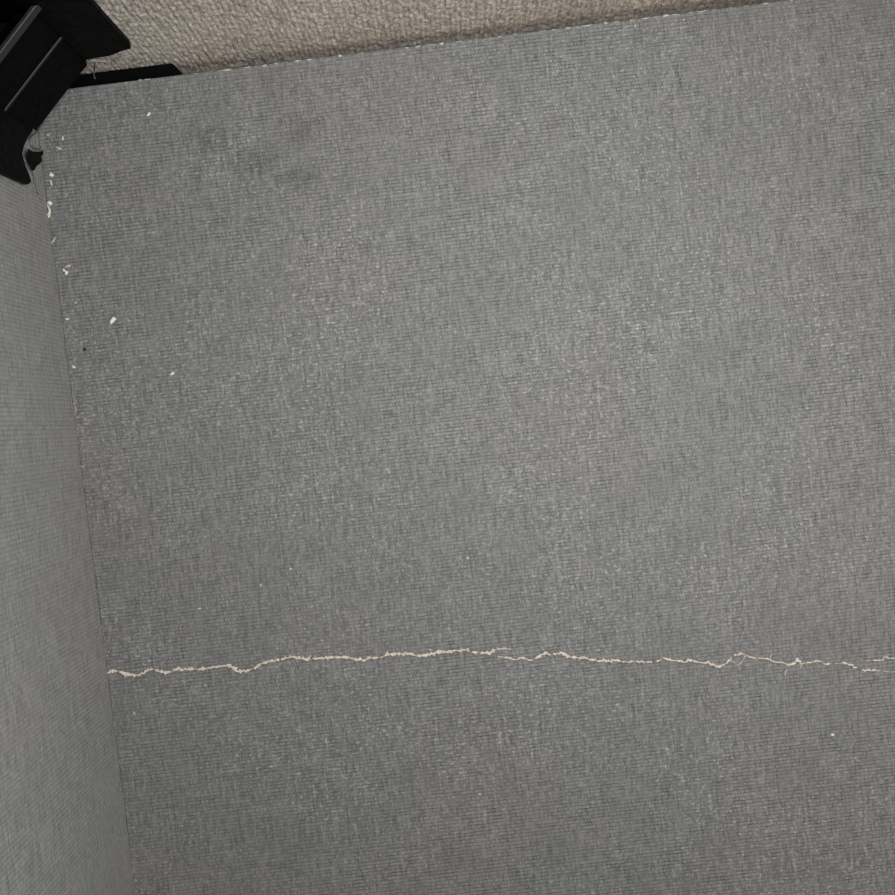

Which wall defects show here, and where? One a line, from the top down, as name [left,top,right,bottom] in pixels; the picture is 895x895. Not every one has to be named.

crack [107,647,895,679]